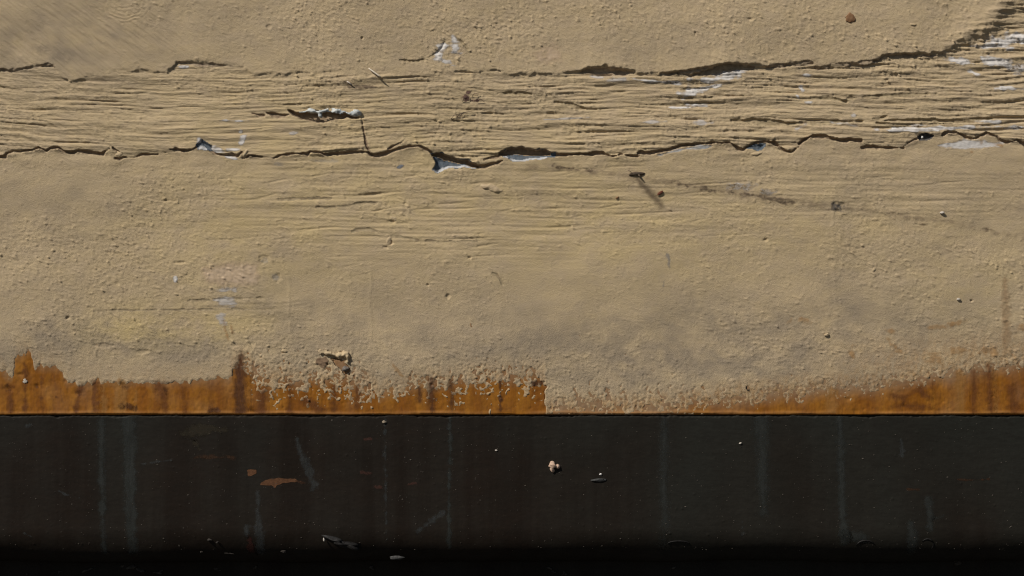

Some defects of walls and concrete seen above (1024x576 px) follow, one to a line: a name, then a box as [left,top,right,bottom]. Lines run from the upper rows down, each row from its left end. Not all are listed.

crack [399,37,471,63]
peeling [288,108,362,123]
crack [0,121,432,161]
spalling [430,152,481,174]
crack [475,155,503,169]
spalling [499,146,556,162]